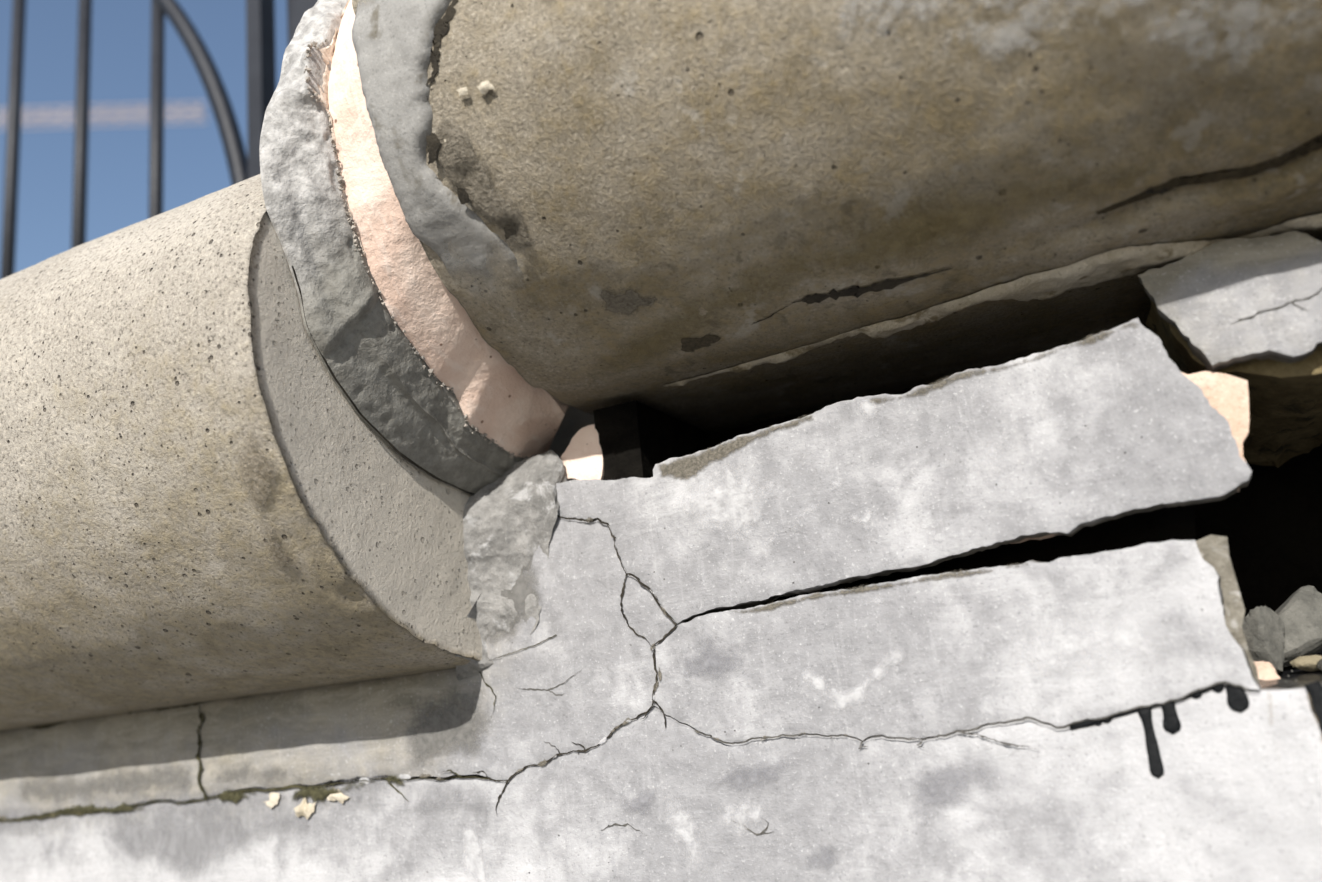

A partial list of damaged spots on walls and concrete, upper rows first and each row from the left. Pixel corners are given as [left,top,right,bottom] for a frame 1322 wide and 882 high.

damp [1157,0,1256,54]
crack [1096,136,1322,215]
spalling [304,39,535,460]
crack [753,268,952,324]
crack [1232,288,1322,324]
spalling [556,318,1281,743]
crack [0,504,1258,823]
crack [730,817,774,835]